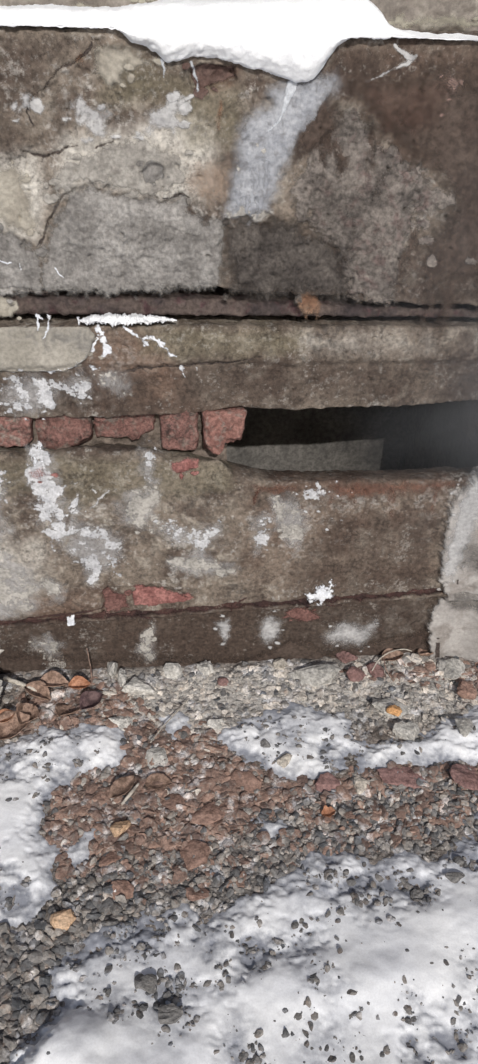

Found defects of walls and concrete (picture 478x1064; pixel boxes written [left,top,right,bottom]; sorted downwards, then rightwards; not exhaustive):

crack [26,42,92,125]
crack [23,141,113,162]
damp [192,77,347,222]
crack [36,192,70,247]
damp [357,69,478,321]
damp [24,441,123,584]
damp [254,481,353,546]
damp [0,553,60,616]
damp [0,611,430,674]